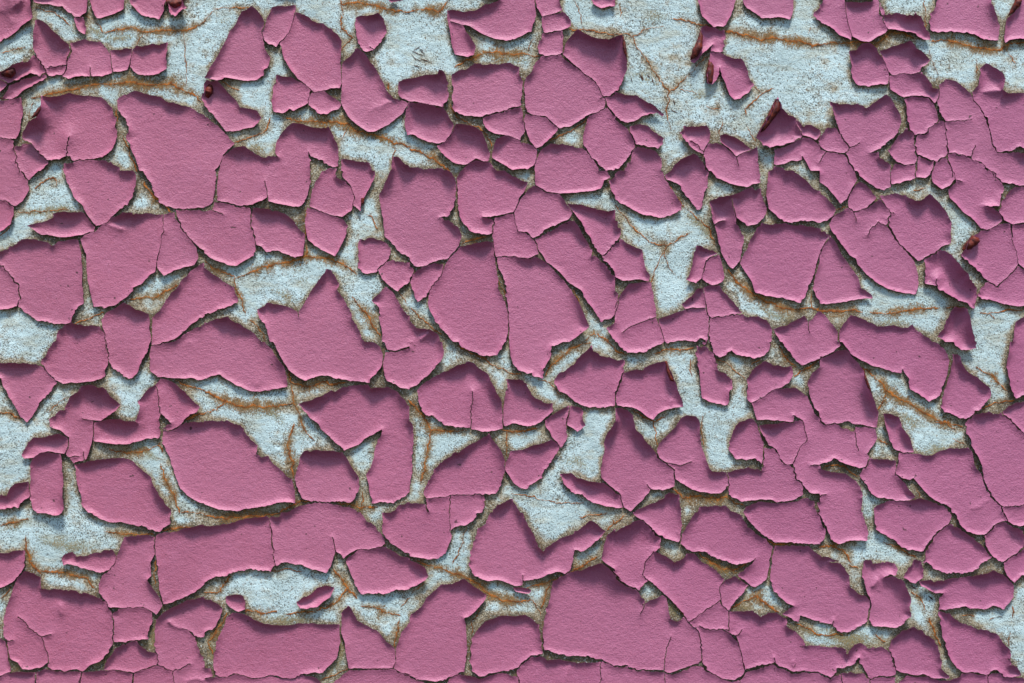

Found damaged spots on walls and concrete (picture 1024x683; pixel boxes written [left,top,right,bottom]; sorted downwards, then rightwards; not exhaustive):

crack [29,6,249,114]
rust [731,28,812,50]
crack [570,1,1024,140]
rust [826,29,905,48]
peeling [0,19,375,422]
peeling [201,0,1024,405]
crack [176,371,346,476]
rust [210,377,338,469]
peeling [257,269,444,503]
rust [868,370,959,429]
peeling [0,307,1024,683]
crack [204,527,597,654]